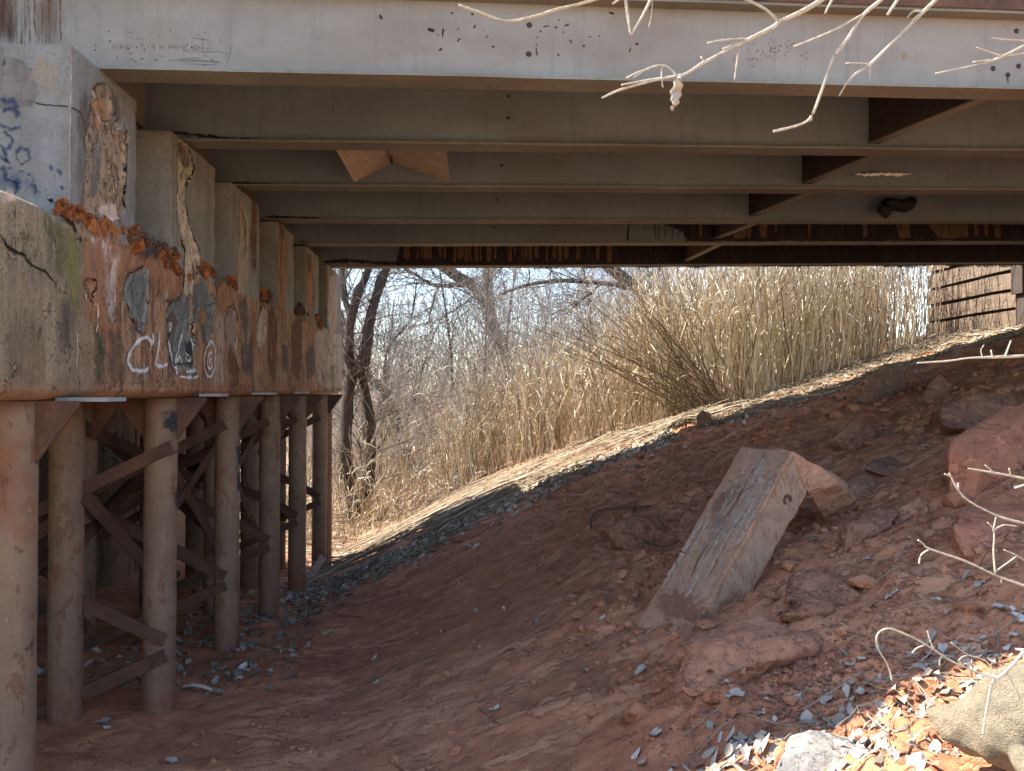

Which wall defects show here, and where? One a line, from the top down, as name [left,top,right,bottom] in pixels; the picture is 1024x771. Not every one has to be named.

crack [27,101,116,135]
spalling [81,83,129,222]
crack [1,235,58,289]
spalling [83,263,151,391]
corrosion [48,197,239,385]
spalling [164,138,217,371]